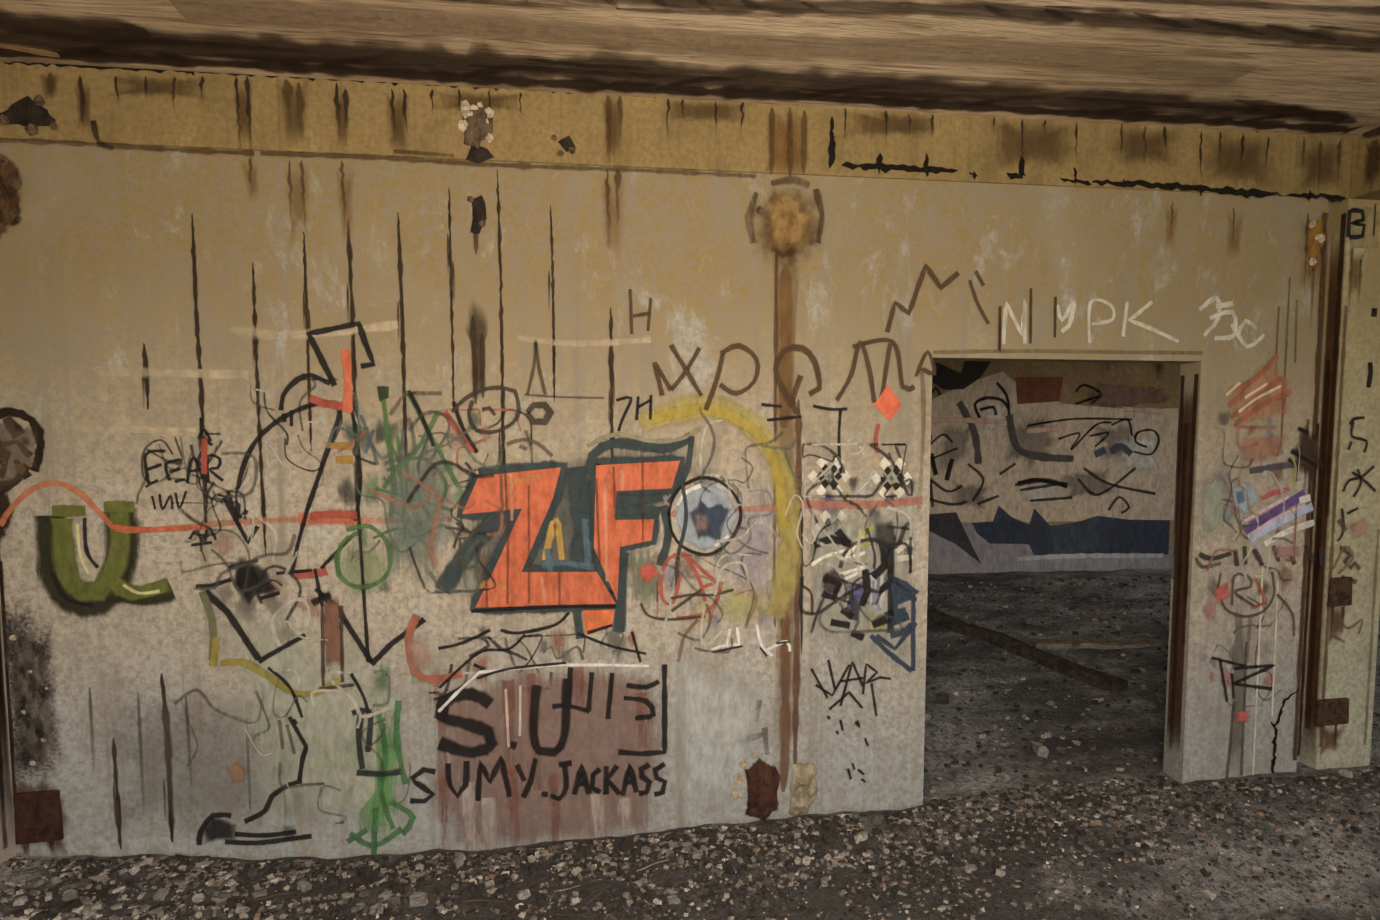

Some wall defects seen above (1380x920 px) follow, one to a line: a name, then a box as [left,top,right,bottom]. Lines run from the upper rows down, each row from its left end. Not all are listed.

water stain [169,0,1247,82]
water stain [293,58,394,135]
spalling [458,100,494,163]
water stain [455,59,617,110]
water stain [799,89,934,133]
water stain [1199,100,1286,174]
corrosion [0,153,22,234]
water stain [23,73,757,497]
water stain [934,349,1202,370]
corrosion [774,252,803,792]
corrosion [1293,213,1348,760]
water stain [0,558,61,850]